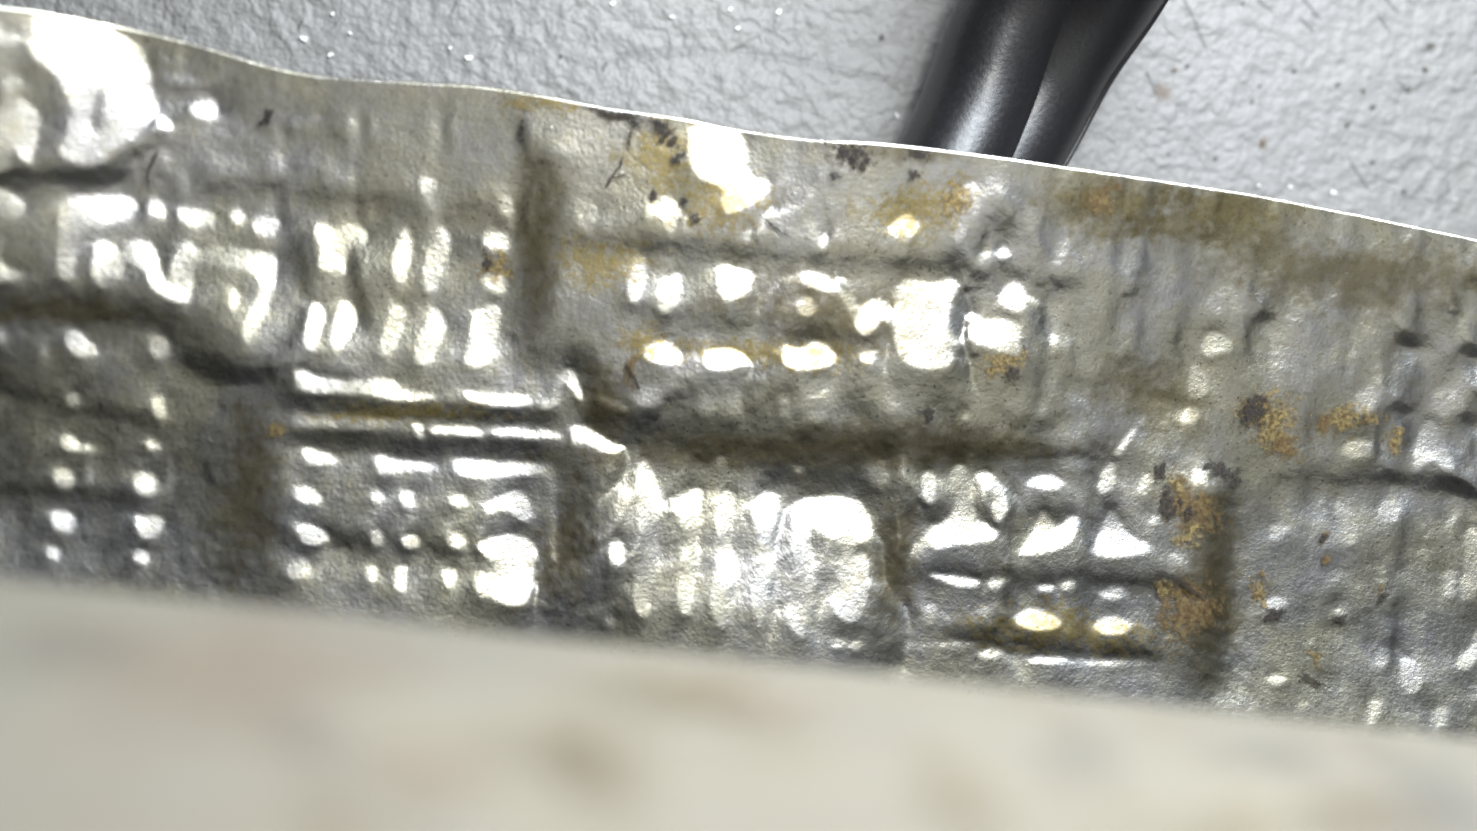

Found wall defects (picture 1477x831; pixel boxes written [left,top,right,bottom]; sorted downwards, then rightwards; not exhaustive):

rust [1235,388,1302,463]
rust [1316,403,1404,455]
rust [1170,468,1222,548]
rust [1155,580,1224,646]